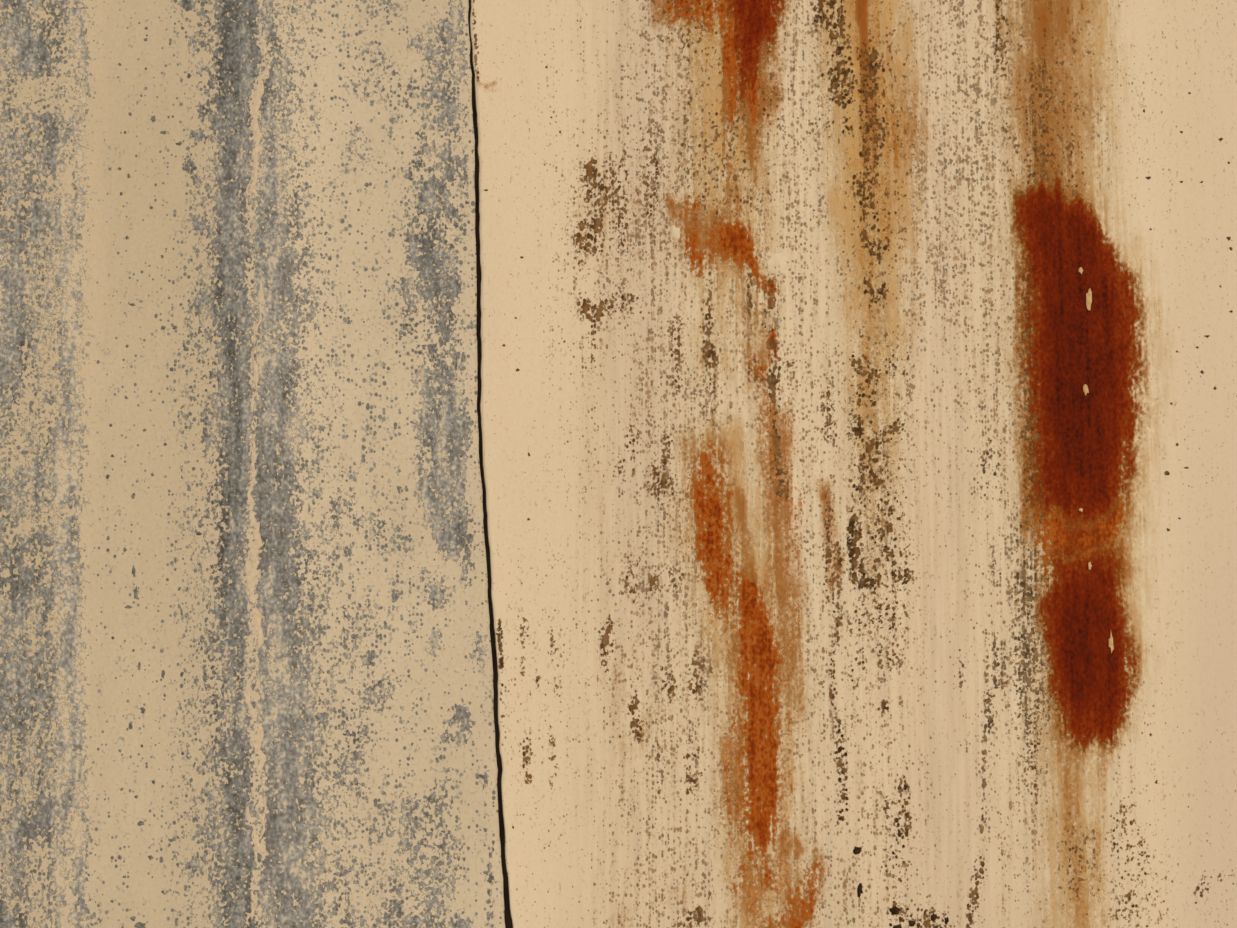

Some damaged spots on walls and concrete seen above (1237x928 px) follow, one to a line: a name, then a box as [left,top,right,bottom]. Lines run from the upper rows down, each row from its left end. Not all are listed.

corrosion [567,0,824,928]
corrosion [811,0,923,826]
corrosion [872,776,951,928]
corrosion [993,0,1148,756]